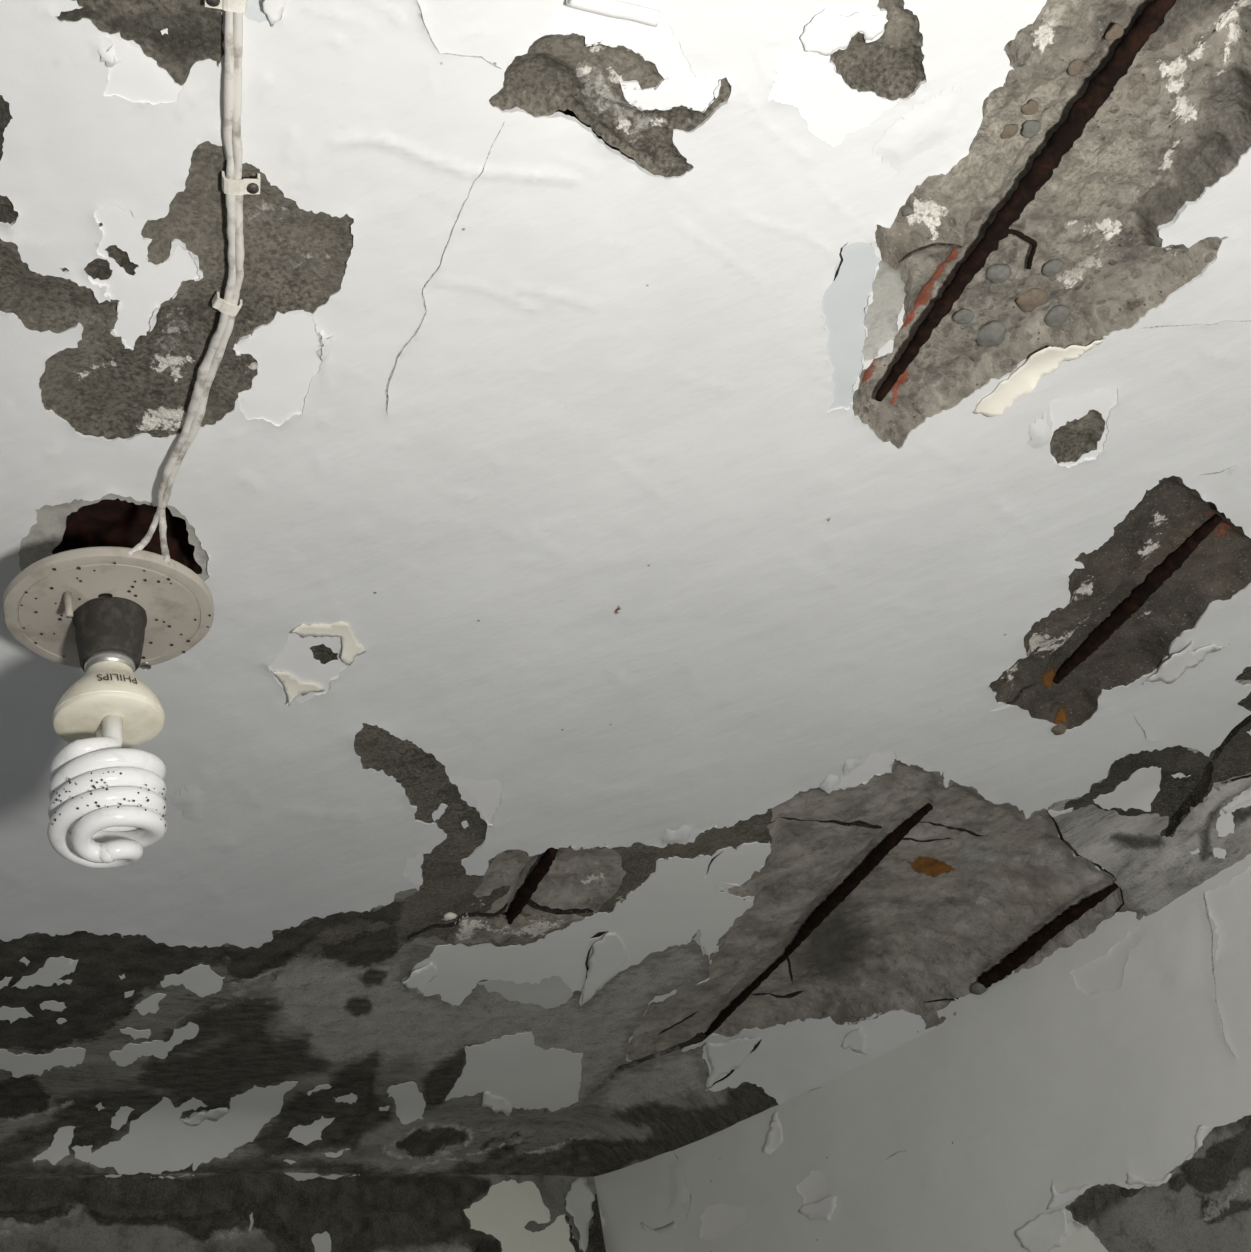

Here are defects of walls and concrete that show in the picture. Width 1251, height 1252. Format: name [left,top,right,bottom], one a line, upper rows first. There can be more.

peeling [0,141,353,439]
crack [385,121,505,412]
spalling [489,33,730,178]
spalling [830,0,925,100]
corrosion [891,368,908,404]
corrosion [901,243,965,329]
spalling [852,0,1251,449]
spalling [1050,409,1105,463]
spalling [989,476,1251,730]
leakage [0,899,777,1252]
peeling [0,667,1251,1252]
corrosion [909,857,953,877]